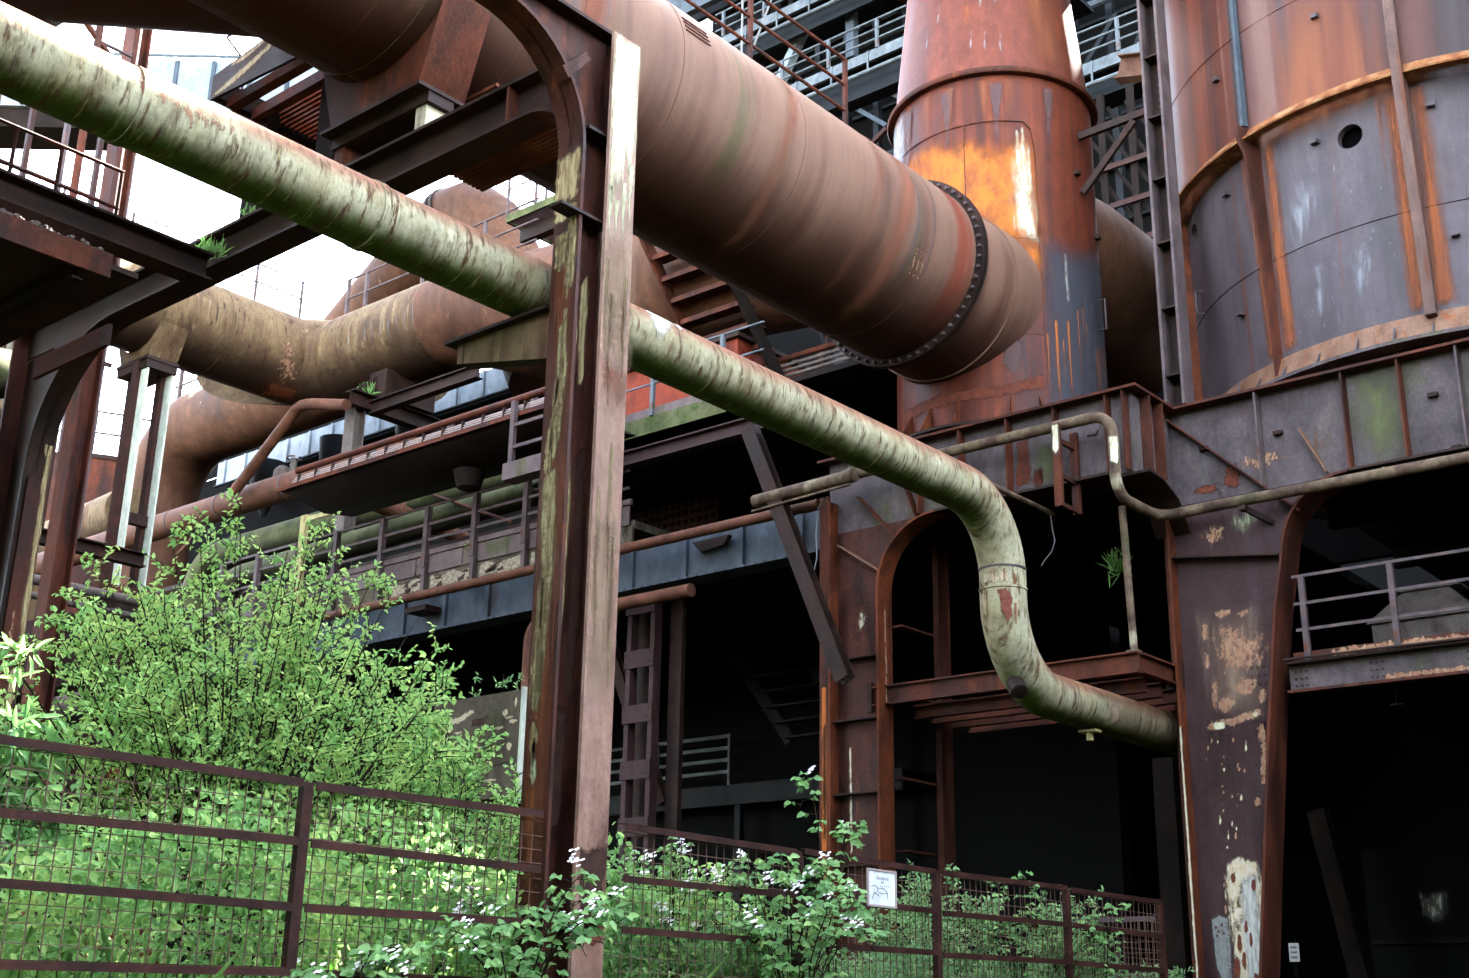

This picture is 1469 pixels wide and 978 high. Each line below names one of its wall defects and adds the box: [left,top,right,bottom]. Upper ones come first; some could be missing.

rust [839,83,1038,321]
rust [1044,88,1053,140]
rust [1375,88,1453,310]
rust [1047,308,1107,396]
peeling [1207,708,1266,978]